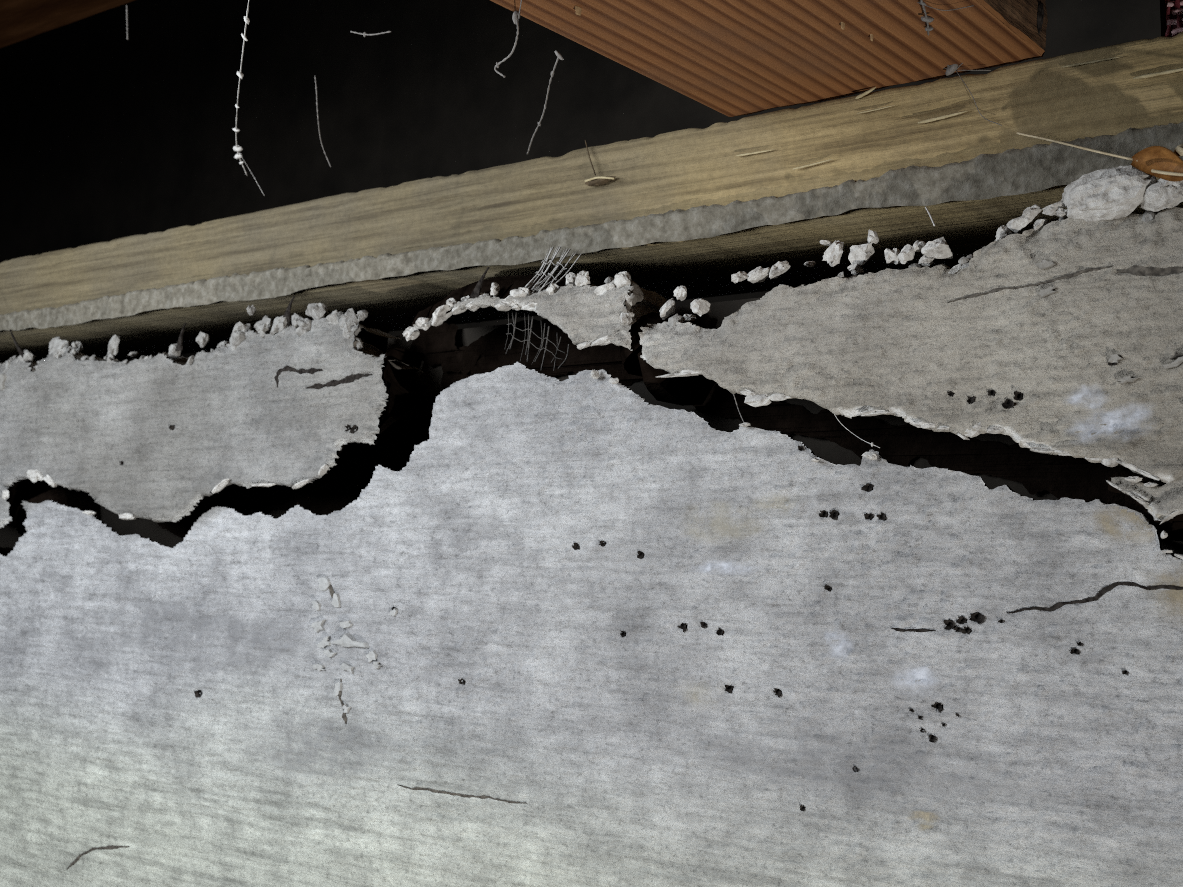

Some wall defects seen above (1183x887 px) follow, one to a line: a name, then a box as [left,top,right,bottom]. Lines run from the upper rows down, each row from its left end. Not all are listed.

spalling [995,165,1183,241]
spalling [804,229,974,278]
spalling [731,261,806,288]
spalling [947,265,1183,303]
spalling [0,267,711,391]
crack [0,274,1183,556]
spalling [967,390,1022,409]
crack [1008,582,1183,613]
crack [891,626,935,634]